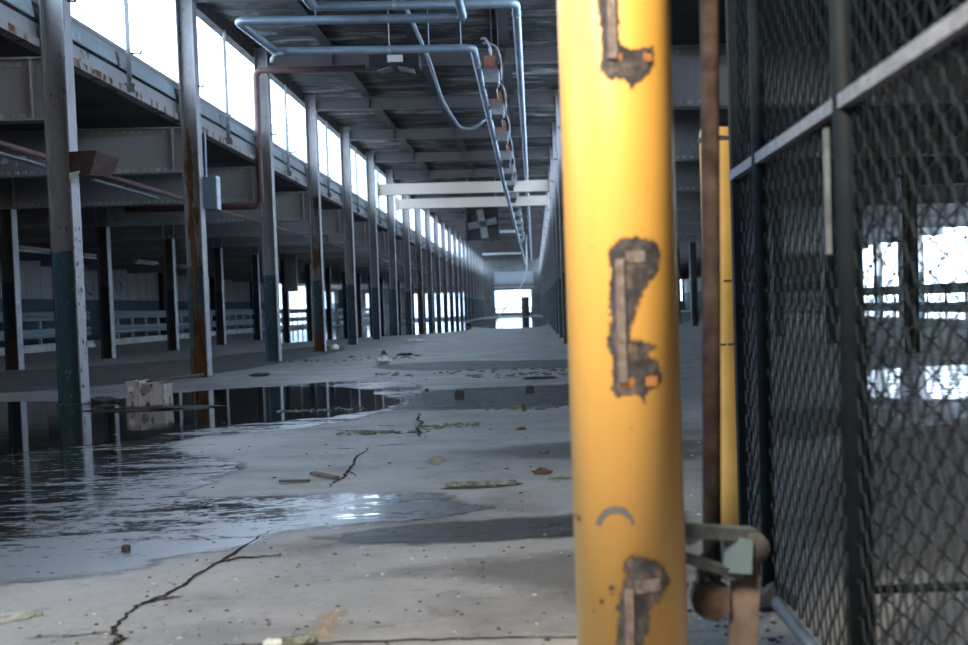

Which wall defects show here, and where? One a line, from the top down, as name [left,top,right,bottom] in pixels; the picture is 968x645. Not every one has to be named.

rust [186,129,207,376]
crack [330,413,424,487]
crack [26,528,281,645]
crack [299,636,577,645]